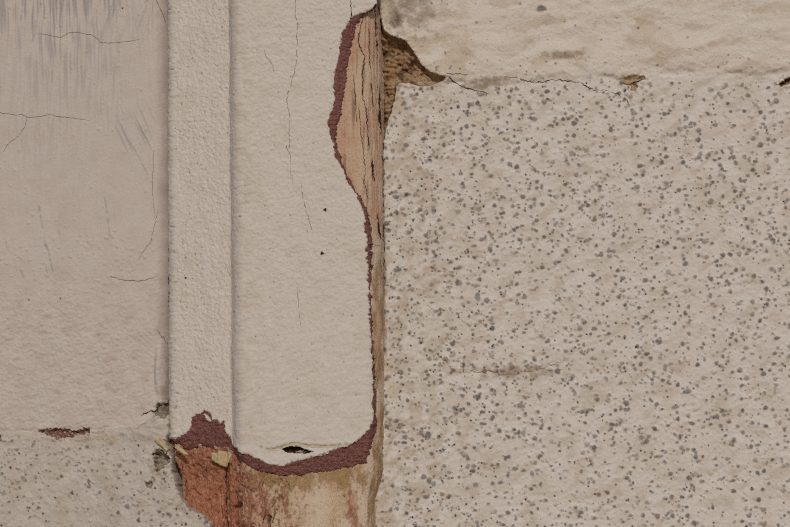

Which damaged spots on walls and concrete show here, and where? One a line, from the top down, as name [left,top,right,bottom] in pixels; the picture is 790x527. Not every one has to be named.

spalling [620,75,645,91]
crack [0,112,85,152]
spalling [152,4,447,476]
spalling [38,427,90,440]